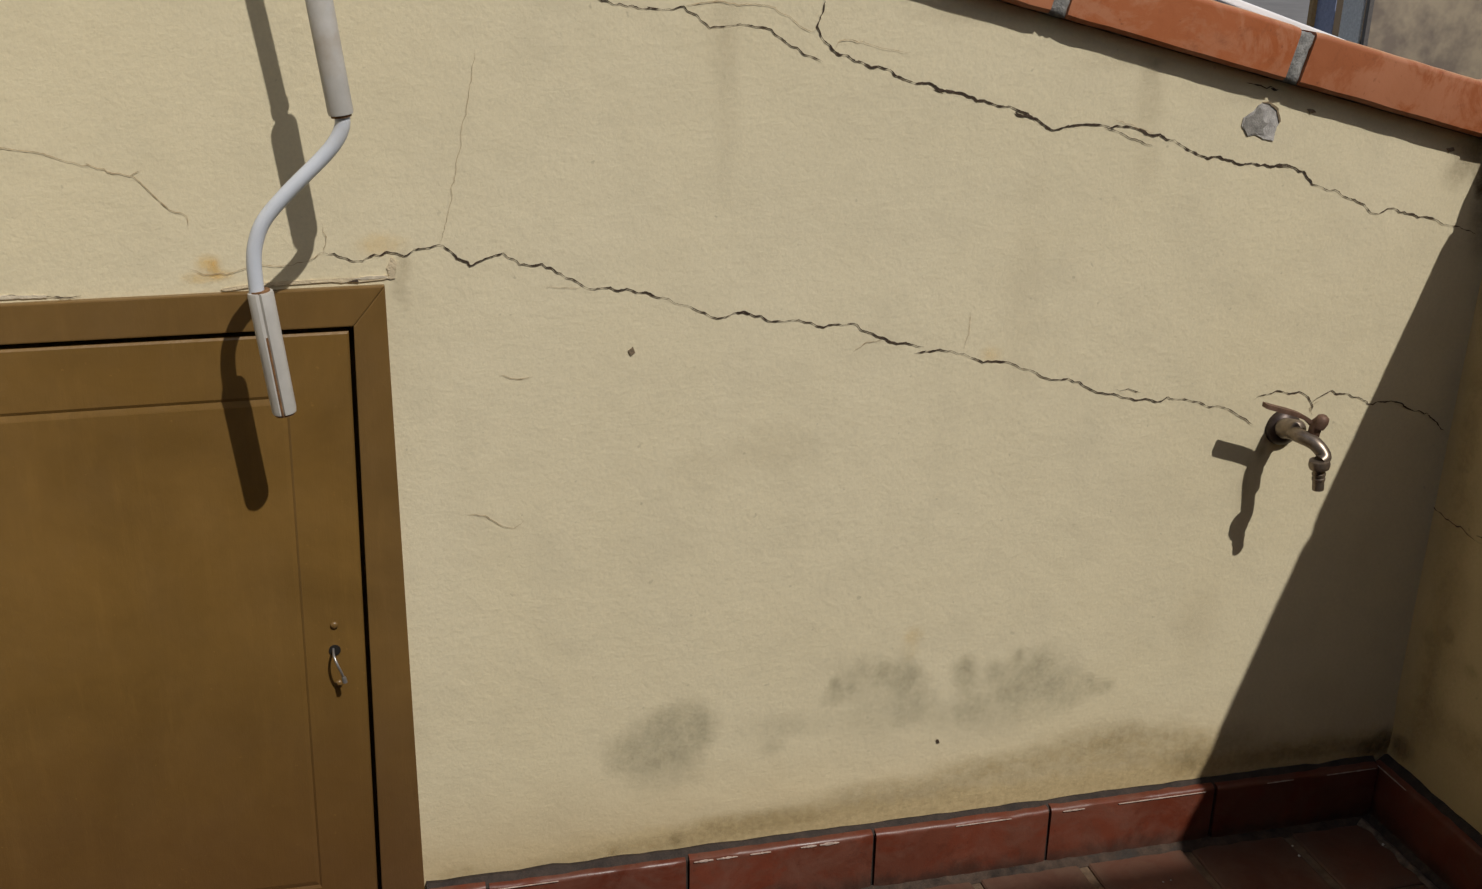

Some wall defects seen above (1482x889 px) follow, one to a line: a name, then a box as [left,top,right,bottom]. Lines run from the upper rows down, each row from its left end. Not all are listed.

crack [0,147,188,222]
crack [194,50,1443,430]
crack [601,0,1475,234]
peeling [1241,101,1281,141]